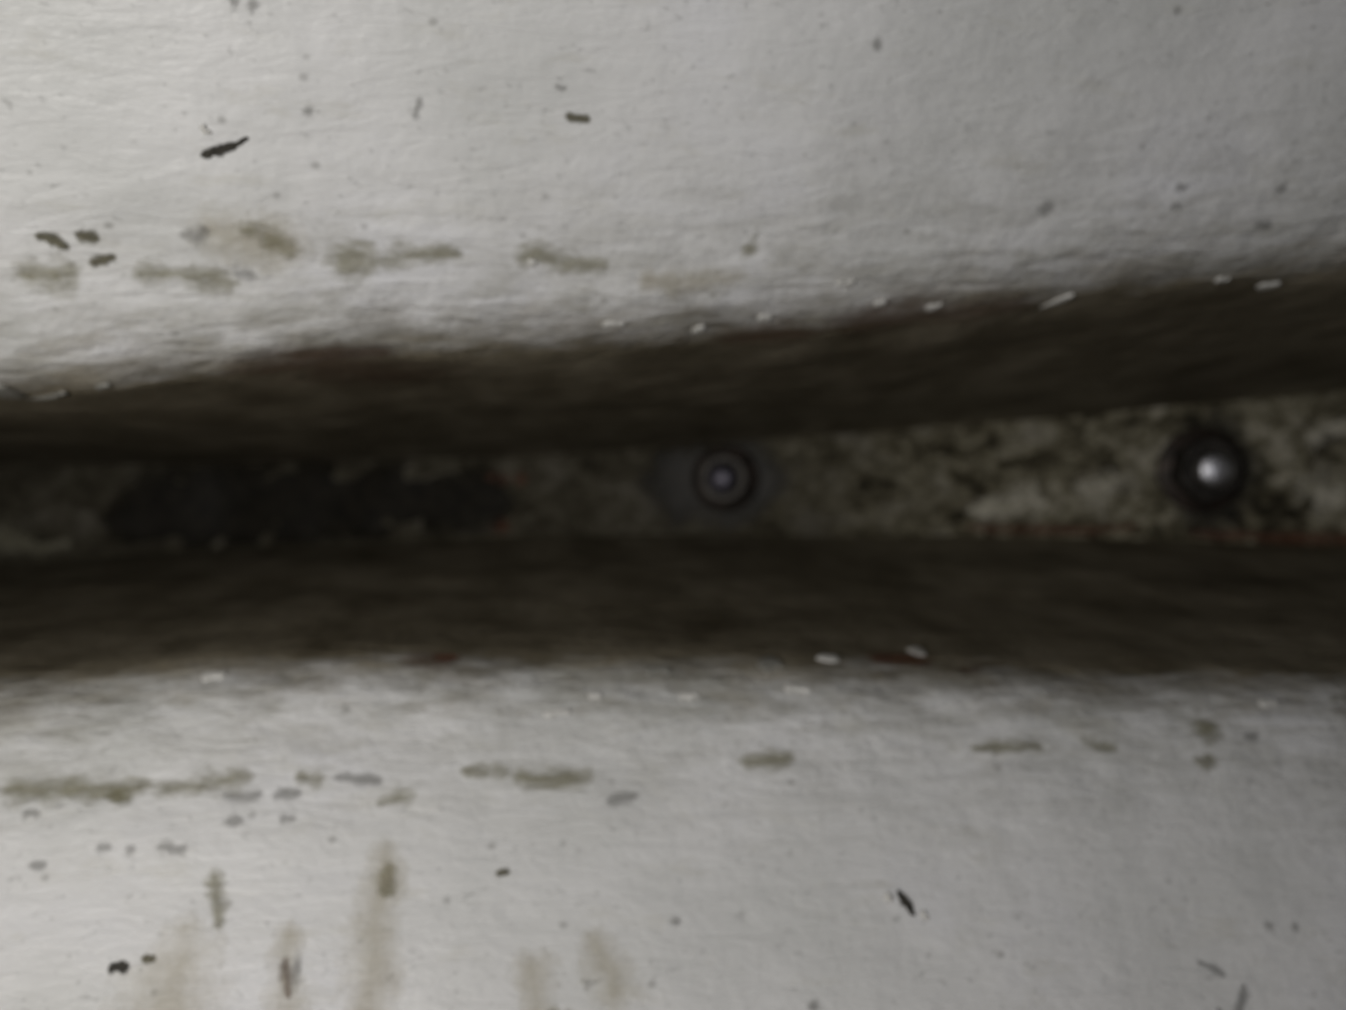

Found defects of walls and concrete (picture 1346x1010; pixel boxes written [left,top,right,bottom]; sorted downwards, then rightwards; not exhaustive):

leakage [35,231,115,266]
leakage [1306,418,1346,448]